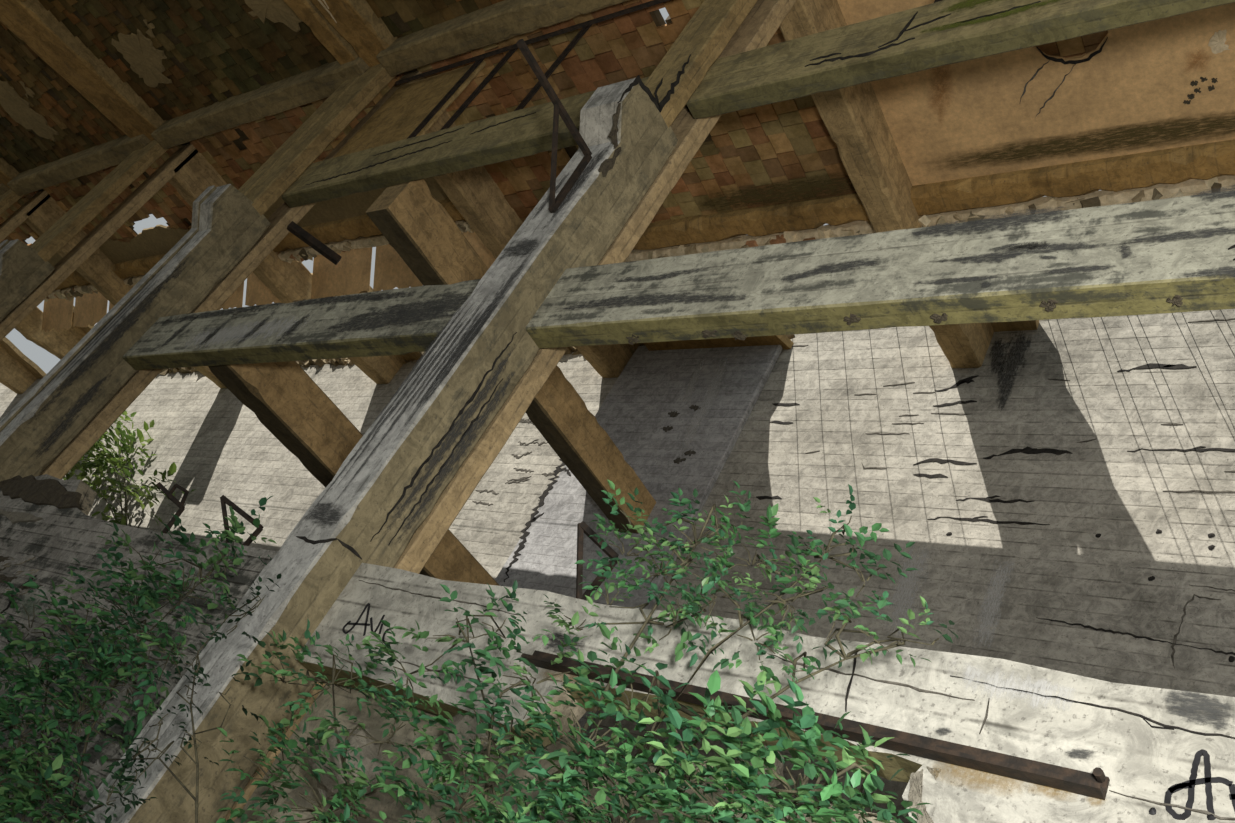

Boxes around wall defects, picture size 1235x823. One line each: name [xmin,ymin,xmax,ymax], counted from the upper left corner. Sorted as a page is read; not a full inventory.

peeling [0,80,59,142]
peeling [112,19,172,88]
peeling [245,0,303,32]
crack [617,54,691,113]
crack [805,1,1041,67]
crack [1020,37,1108,116]
damp [953,116,1235,166]
crack [296,332,571,617]
crack [1036,585,1235,669]
crack [400,661,494,684]
crack [767,652,1235,739]
crack [1110,790,1235,821]